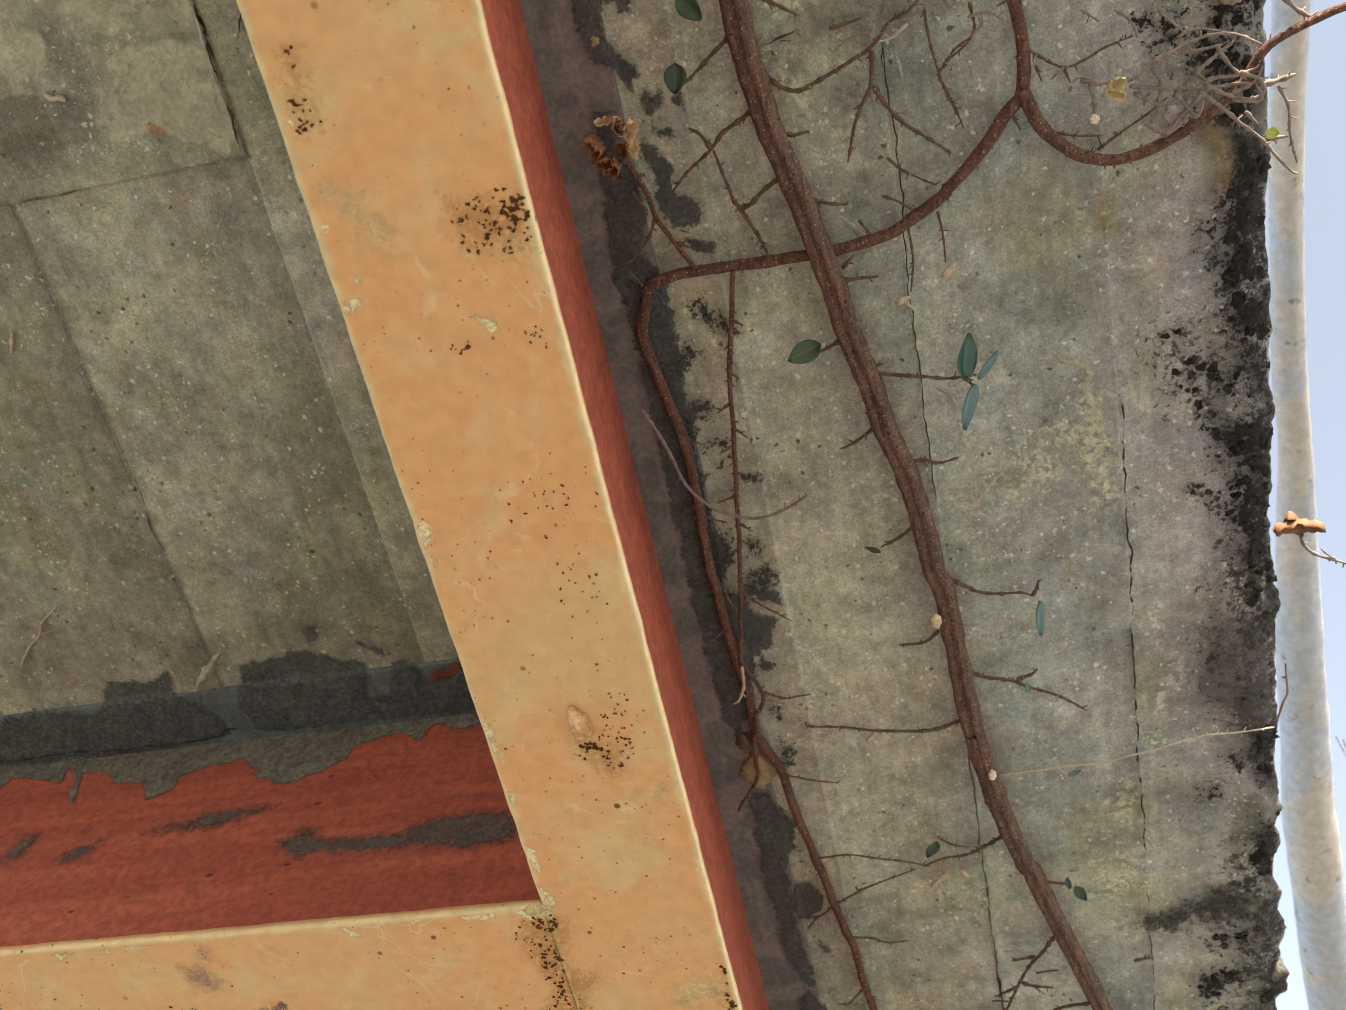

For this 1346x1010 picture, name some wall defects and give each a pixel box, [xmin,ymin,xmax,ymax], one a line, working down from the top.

water stain [757,0,818,30]
water stain [762,59,815,126]
water stain [572,0,782,736]
water stain [1115,0,1279,804]
crack [1119,394,1146,850]
peeling [482,722,507,763]
water stain [768,700,799,768]
peeling [515,834,556,921]
water stain [748,793,832,1010]
crack [1147,894,1155,1010]
water stain [1132,808,1288,1010]